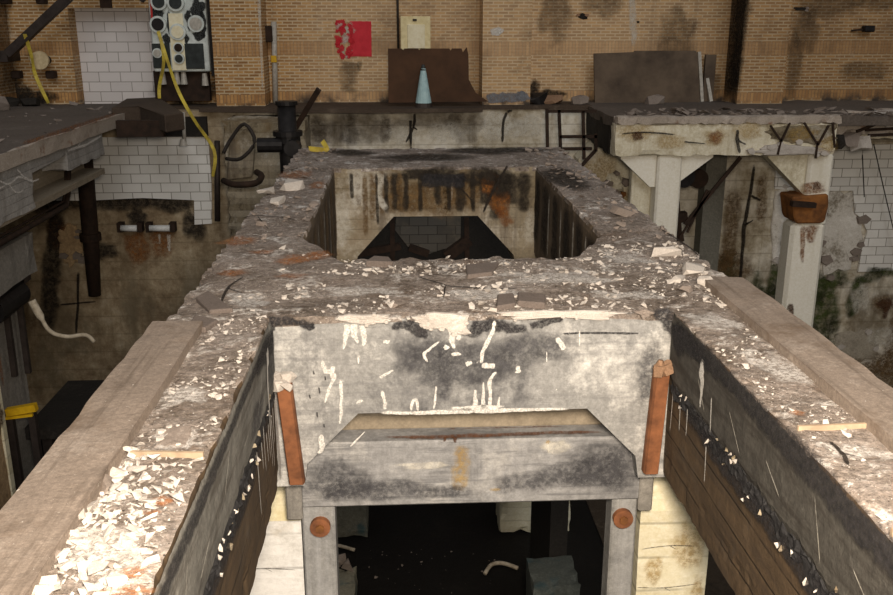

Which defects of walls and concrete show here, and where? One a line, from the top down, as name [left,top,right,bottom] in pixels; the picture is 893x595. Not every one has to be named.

spalling [746,110,893,158]
damp [315,174,593,260]
rust [801,225,816,258]
spalling [821,191,871,281]
damp [321,361,343,424]
spalling [334,313,391,327]
spalling [406,312,472,337]
damp [381,321,566,415]
spalling [496,308,655,322]
damp [858,319,893,388]